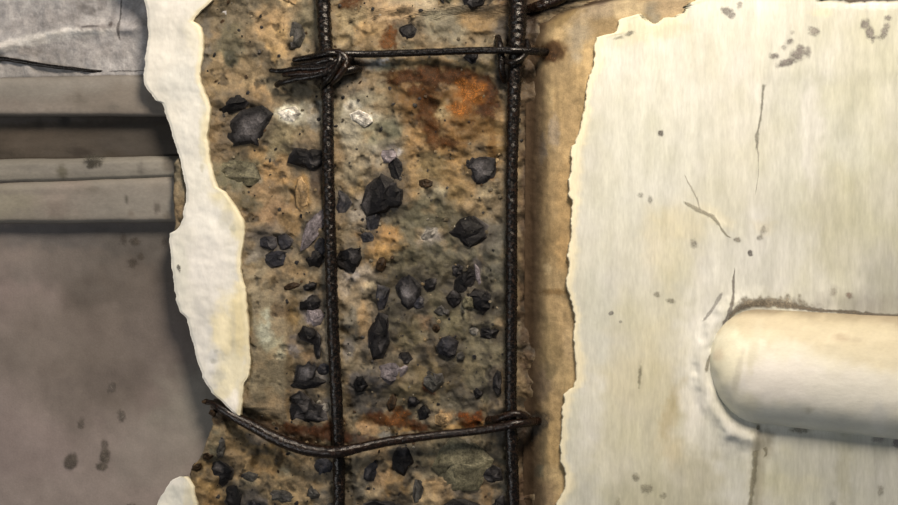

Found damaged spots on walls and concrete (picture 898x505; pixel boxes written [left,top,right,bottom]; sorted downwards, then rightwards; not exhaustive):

corrosion [386,64,500,150]
crack [756,85,765,154]
crack [685,179,729,237]
spalling [143,0,333,505]
spalling [330,0,509,505]
flaking render [516,0,695,505]
corrosion [368,408,428,431]
crack [749,425,767,505]